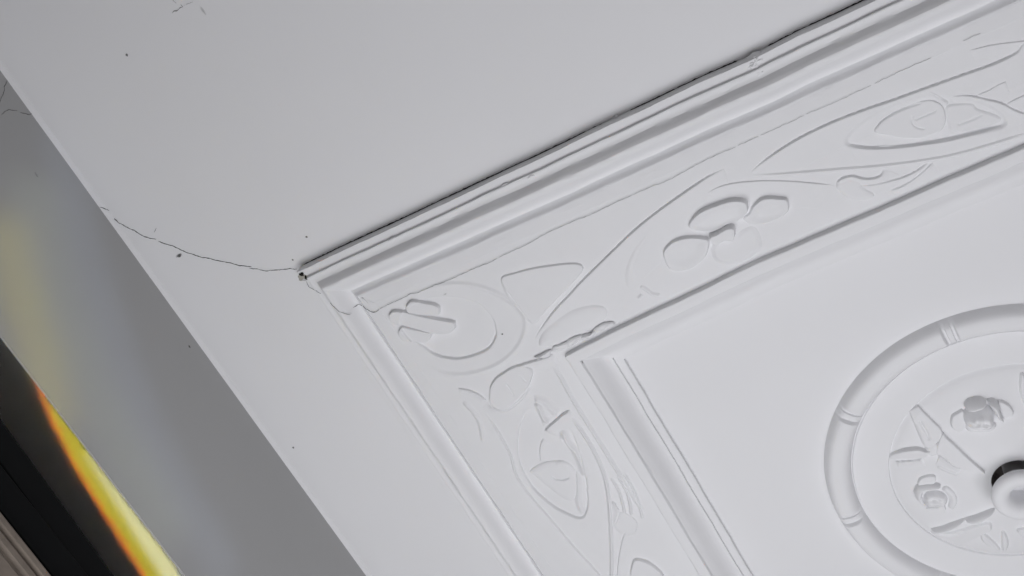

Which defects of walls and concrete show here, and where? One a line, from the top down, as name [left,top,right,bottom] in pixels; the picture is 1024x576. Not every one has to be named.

crack [768,0,863,46]
crack [100,58,930,315]